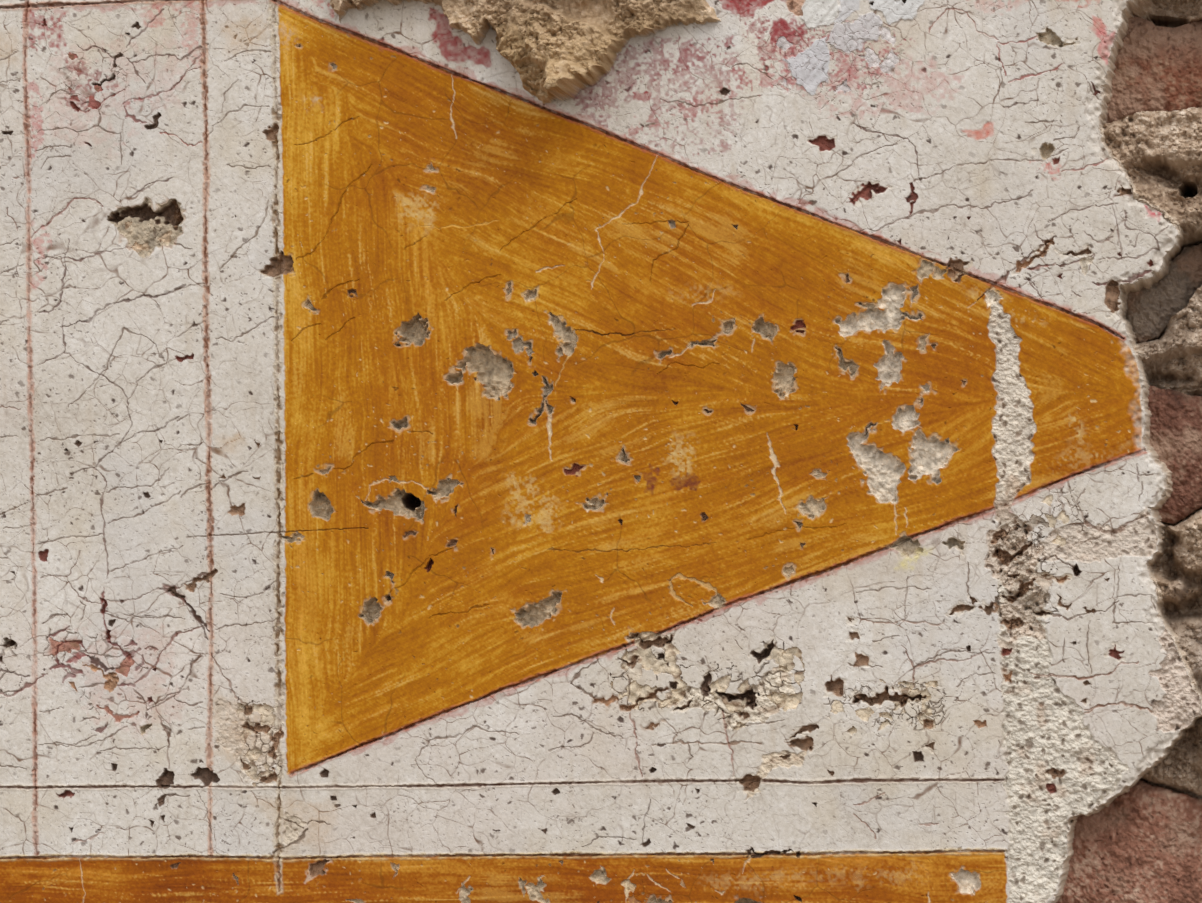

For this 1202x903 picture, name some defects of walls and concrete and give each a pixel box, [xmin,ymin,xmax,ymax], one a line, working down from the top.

crack [13,9,272,180]
spalling [107,198,186,259]
crack [832,8,1169,308]
spalling [835,257,1049,393]
crack [0,163,433,834]
crack [548,658,785,903]
flaking render [592,630,806,731]
spalling [733,675,947,801]
spalling [846,383,959,505]
flaking render [949,487,1158,684]
crack [1029,566,1157,714]
crack [1036,464,1160,581]